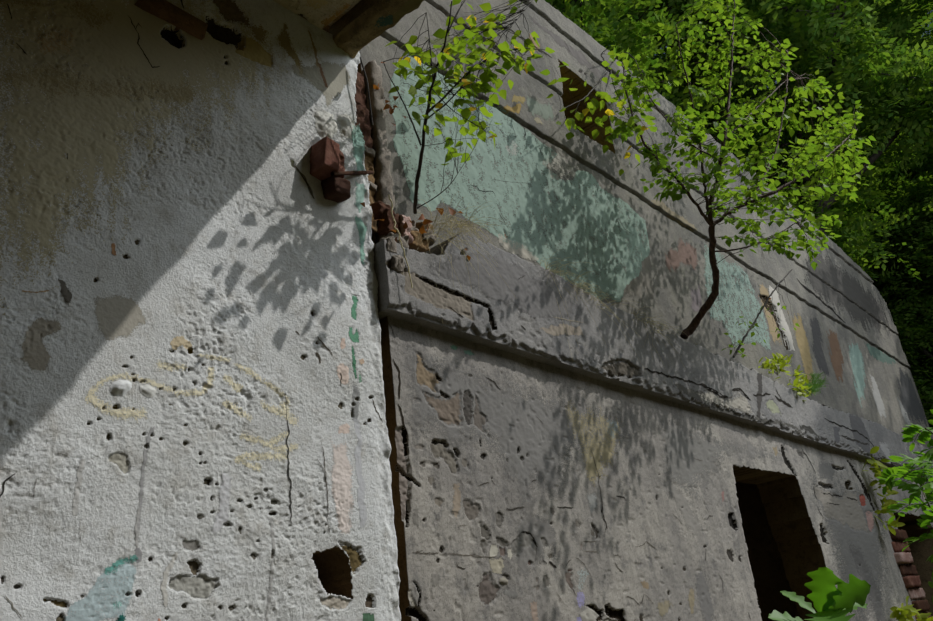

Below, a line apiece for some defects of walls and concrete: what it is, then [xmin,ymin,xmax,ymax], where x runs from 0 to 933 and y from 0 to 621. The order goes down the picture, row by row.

peeling [206,0,273,67]
crack [416,276,497,331]
crack [372,322,419,527]
spalling [168,540,217,608]
crack [405,581,426,621]
crack [414,550,497,569]
crack [521,453,658,621]